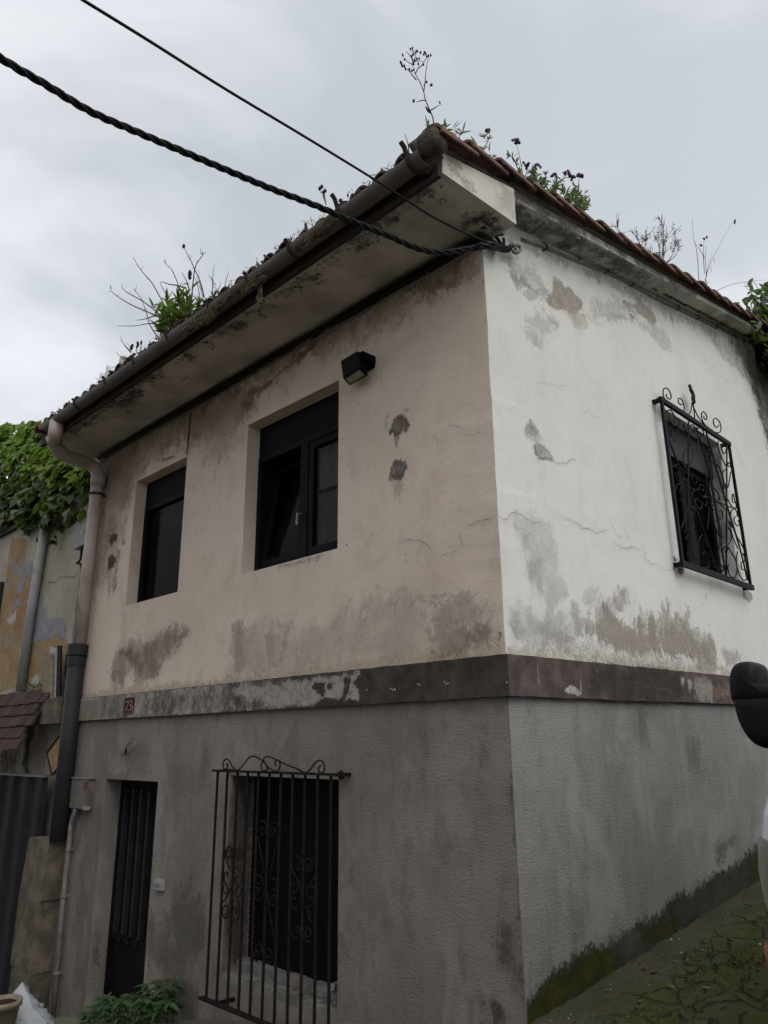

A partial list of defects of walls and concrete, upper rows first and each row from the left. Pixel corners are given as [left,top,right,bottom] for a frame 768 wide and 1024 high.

water stain [512,176,697,302]
spalling [498,239,657,347]
spalling [387,408,410,445]
spalling [389,459,408,490]
spalling [525,419,554,461]
crack [400,512,680,572]
peeling [0,535,69,693]
peeling [79,670,360,721]
water stain [83,585,741,703]
peeling [542,608,732,705]